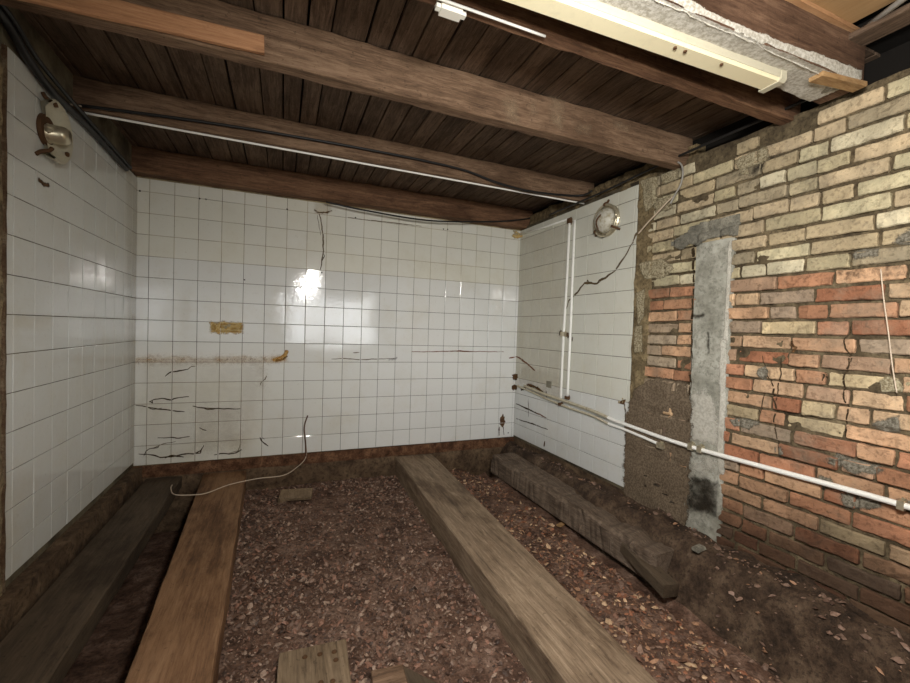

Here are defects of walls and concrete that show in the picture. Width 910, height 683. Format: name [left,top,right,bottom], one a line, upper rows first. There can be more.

peeling [597,0,862,102]
crack [566,229,639,309]
crack [136,366,268,458]
water stain [687,240,732,513]